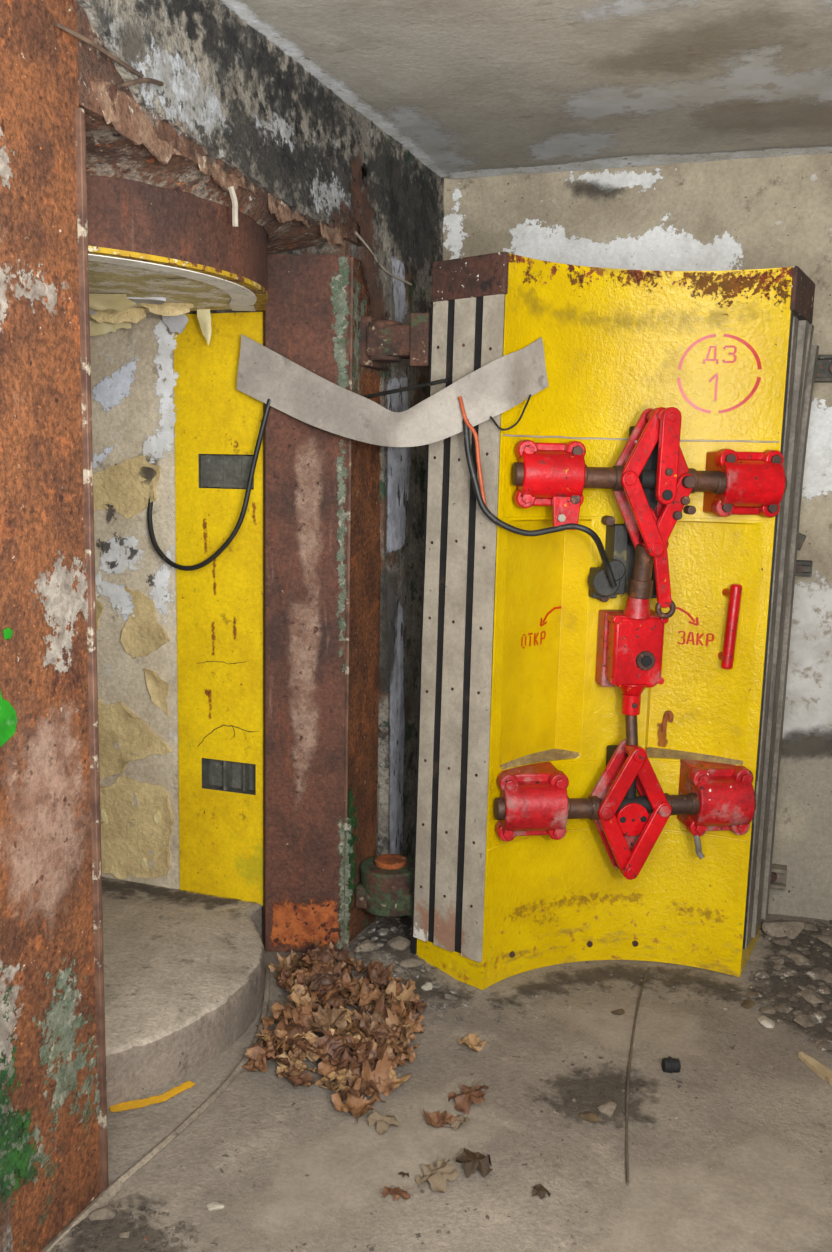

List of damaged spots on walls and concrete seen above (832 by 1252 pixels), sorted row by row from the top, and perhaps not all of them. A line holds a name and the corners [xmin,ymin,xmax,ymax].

flaking render [55,22,380,394]
leakage [131,0,832,323]
corrosion [565,271,588,291]
peeling [503,213,744,271]
corrosion [606,269,791,316]
leakage [387,377,409,412]
peeling [31,294,212,717]
leakage [386,447,411,554]
peeling [802,398,832,507]
peeling [782,571,832,739]
leakage [379,569,405,855]
corrosion [271,899,341,949]